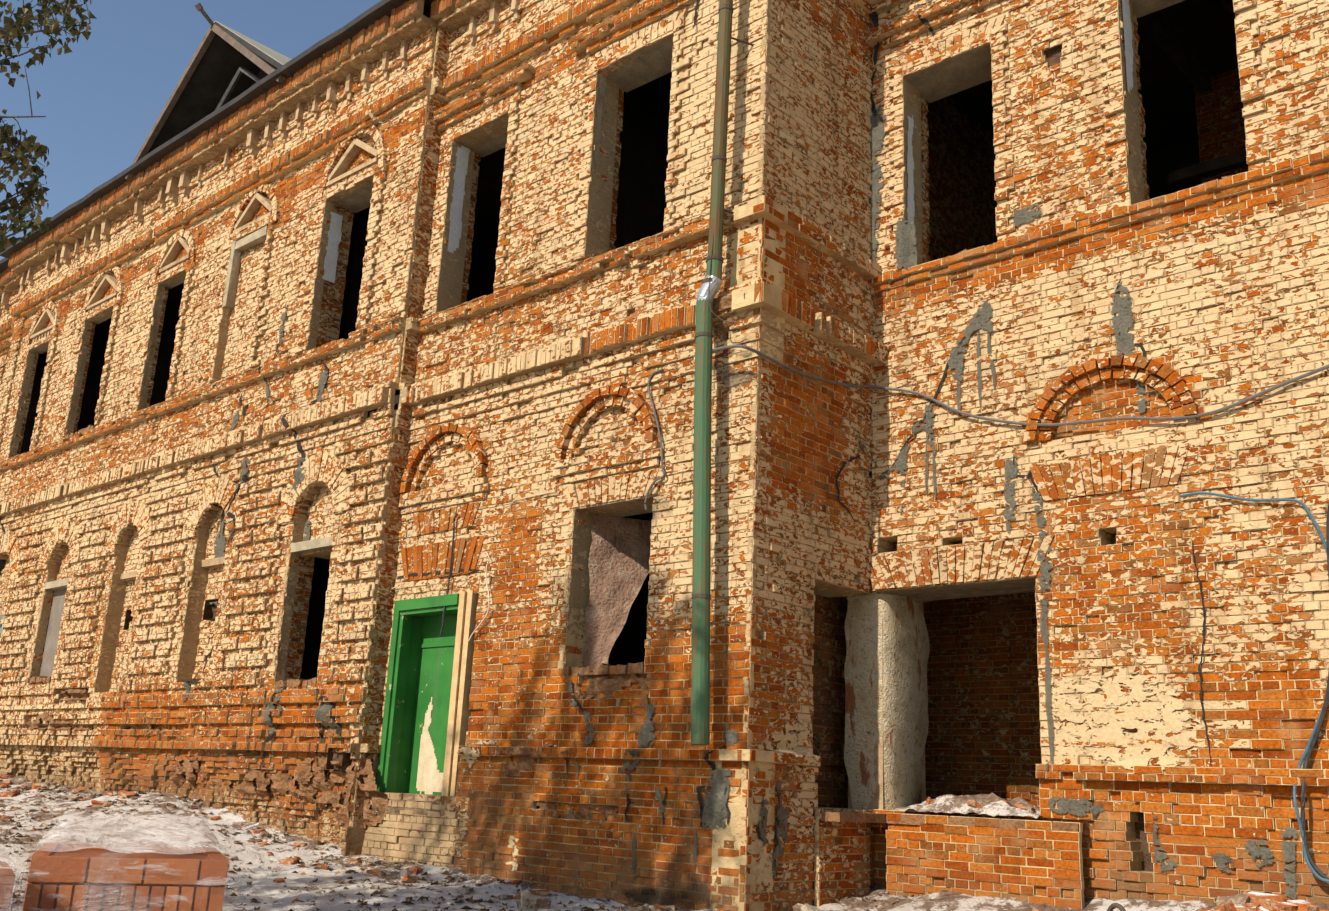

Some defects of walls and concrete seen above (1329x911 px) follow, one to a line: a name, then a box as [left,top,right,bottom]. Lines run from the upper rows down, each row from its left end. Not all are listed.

spalling [1043,44,1062,66]
peeling [1122,0,1134,92]
peeling [447,145,470,253]
peeling [322,212,343,283]
crack [835,300,996,518]
crack [182,307,329,701]
spalling [123,609,133,630]
spalling [20,686,93,730]
peeling [416,697,443,795]
peeling [765,719,820,761]
peeling [1051,672,1207,774]
peeling [505,836,520,871]